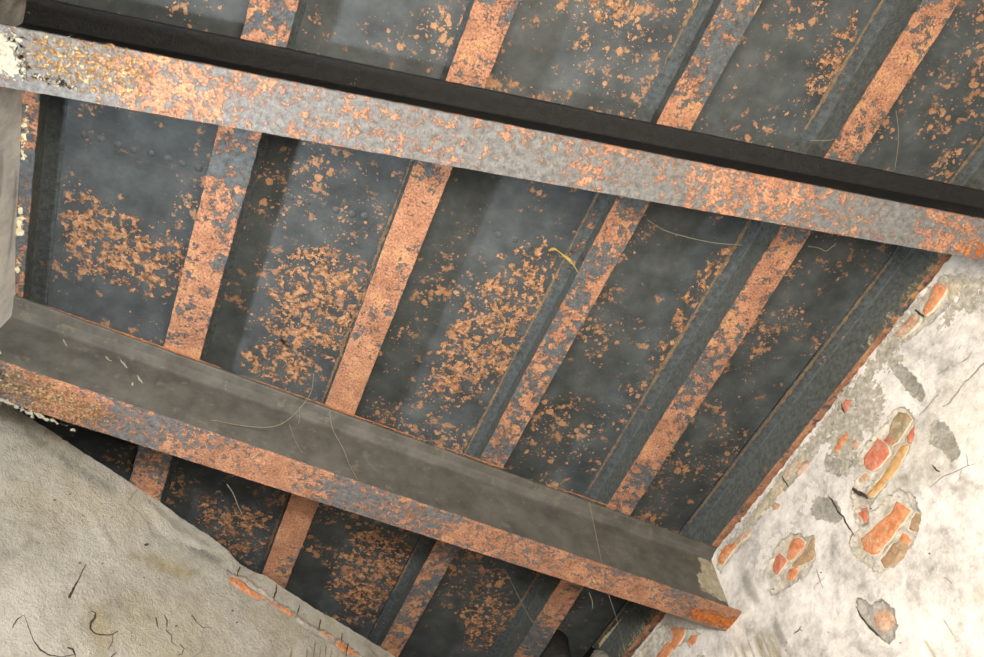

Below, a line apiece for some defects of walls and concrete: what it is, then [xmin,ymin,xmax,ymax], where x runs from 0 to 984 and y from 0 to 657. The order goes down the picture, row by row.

corrosion [590,0,656,24]
corrosion [5,33,153,97]
corrosion [61,195,185,299]
corrosion [241,159,423,440]
corrosion [424,192,599,469]
flaking render [717,273,984,574]
corrosion [194,492,289,560]
corrosion [324,528,423,615]
flaking render [755,524,822,596]
corrosion [462,572,541,651]
flaking render [635,623,705,657]
flaking render [856,597,901,644]